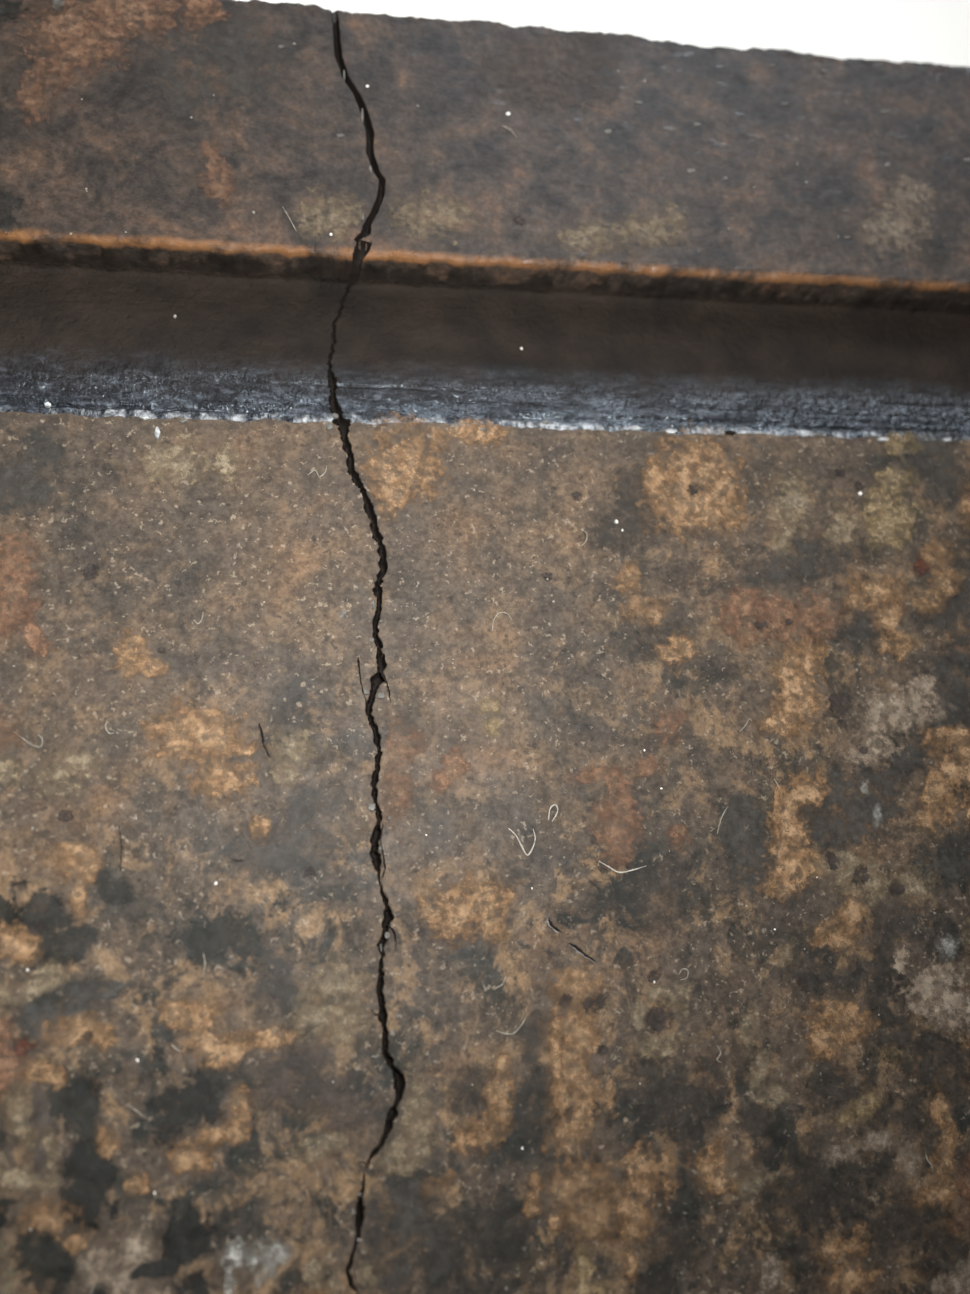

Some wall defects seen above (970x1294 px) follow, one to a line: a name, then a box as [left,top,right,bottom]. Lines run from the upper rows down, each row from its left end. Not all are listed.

corrosion [360,412,508,520]
corrosion [635,426,748,543]
crack [327,12,406,1293]
corrosion [717,431,966,742]
corrosion [140,697,316,797]
corrosion [840,674,970,832]
corrosion [416,869,515,950]
corrosion [755,767,942,978]
corrosion [158,953,373,1069]
corrosion [893,945,970,1090]
corrosion [0,920,172,1294]
corrosion [522,967,783,1294]